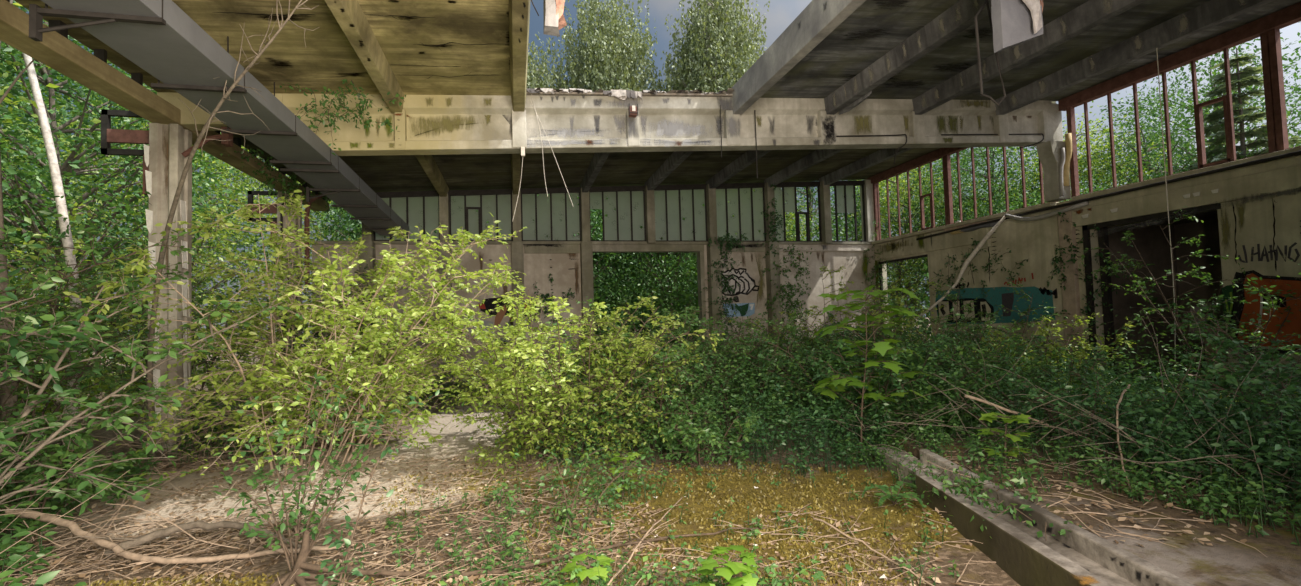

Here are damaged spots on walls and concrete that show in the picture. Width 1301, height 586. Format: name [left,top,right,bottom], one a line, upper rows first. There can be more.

leakage [808,36,938,145]
leakage [937,116,994,133]